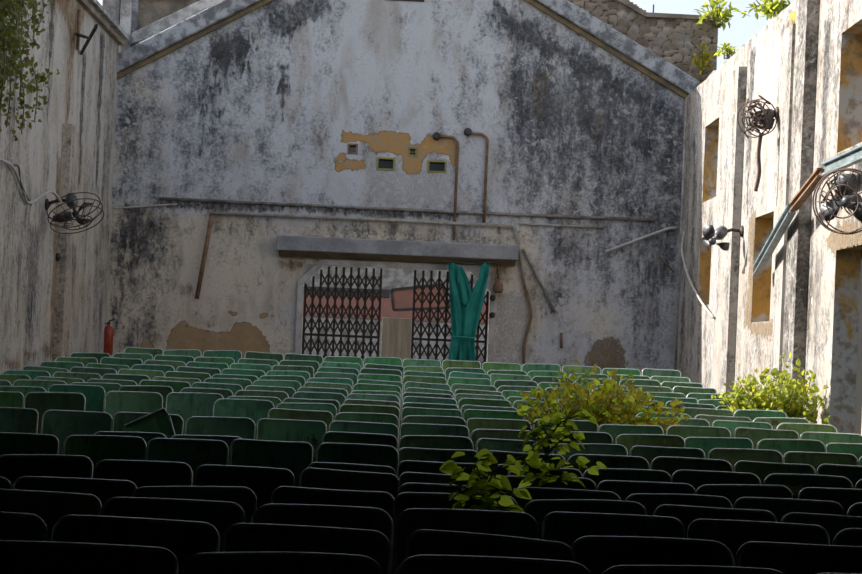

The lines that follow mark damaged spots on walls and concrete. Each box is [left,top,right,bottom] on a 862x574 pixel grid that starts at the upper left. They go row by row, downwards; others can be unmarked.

water stain [96,32,105,148]
water stain [277,63,291,122]
water stain [269,0,331,49]
flaking render [334,130,456,175]
water stain [487,0,665,147]
water stain [747,47,756,160]
water stain [819,0,839,168]
water stain [110,203,162,345]
flaking render [166,311,273,358]
water stain [160,201,458,234]
flaking render [556,315,631,374]
water stain [709,240,719,369]